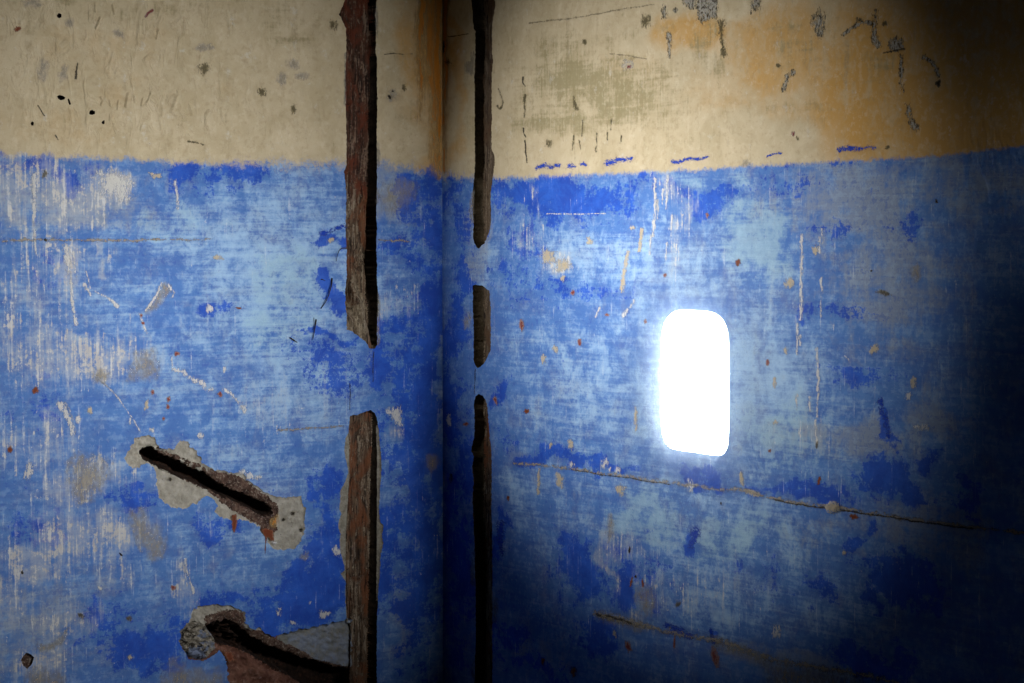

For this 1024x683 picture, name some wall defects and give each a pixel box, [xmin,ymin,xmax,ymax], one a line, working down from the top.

spalling [124,428,306,558]
spalling [178,434,353,683]
crack [512,462,1024,535]